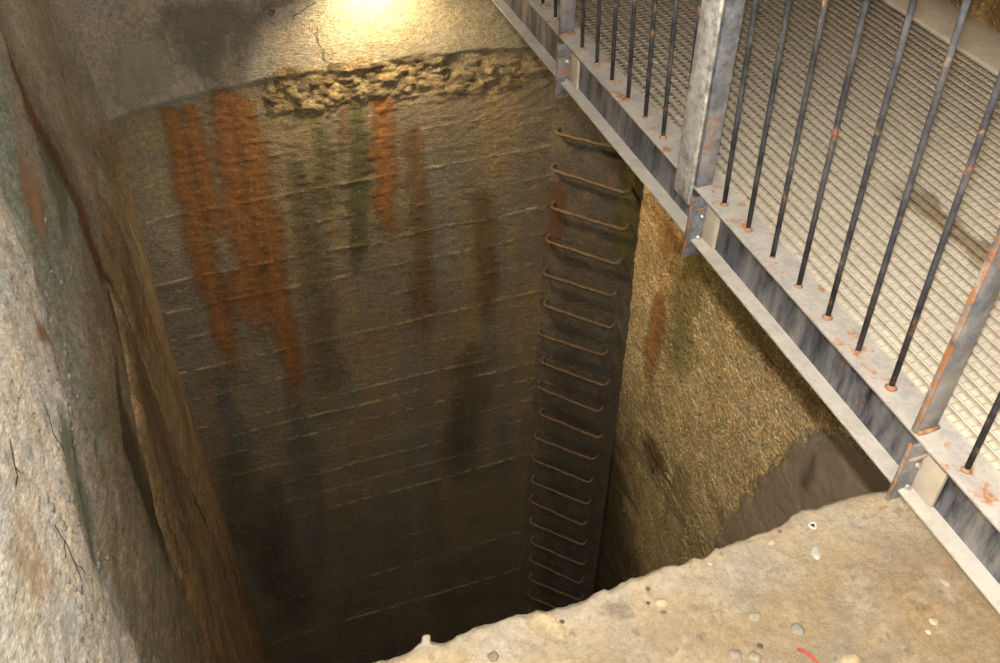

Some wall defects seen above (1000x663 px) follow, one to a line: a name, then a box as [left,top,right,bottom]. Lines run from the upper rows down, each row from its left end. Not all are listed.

spalling [261,54,537,120]
corrosion [369,97,397,228]
corrosion [644,293,666,375]
crack [9,438,21,485]
crack [55,525,86,581]